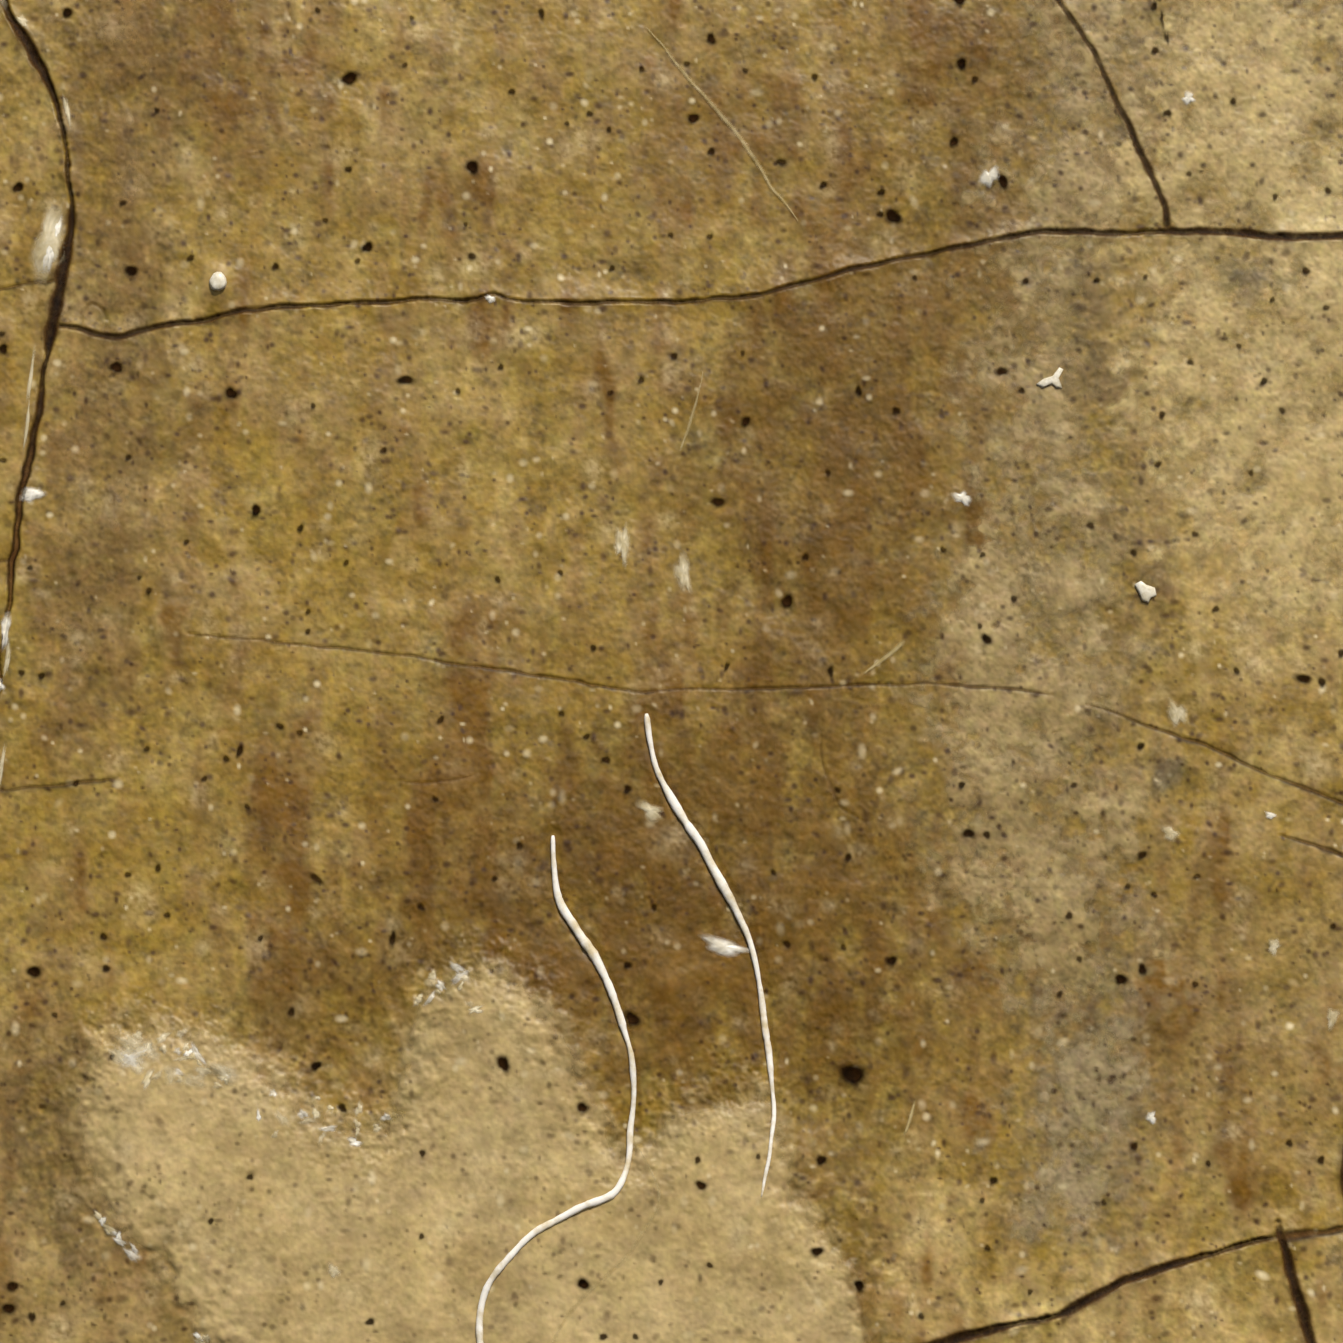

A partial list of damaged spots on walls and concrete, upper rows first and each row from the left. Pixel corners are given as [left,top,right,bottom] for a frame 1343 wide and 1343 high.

crack [0,0,1343,693]
crack [0,751,8,783]
crack [40,780,102,788]
crack [1098,707,1343,805]
crack [1288,836,1343,857]
crack [1335,1148,1343,1194]
crack [928,1226,1343,1343]